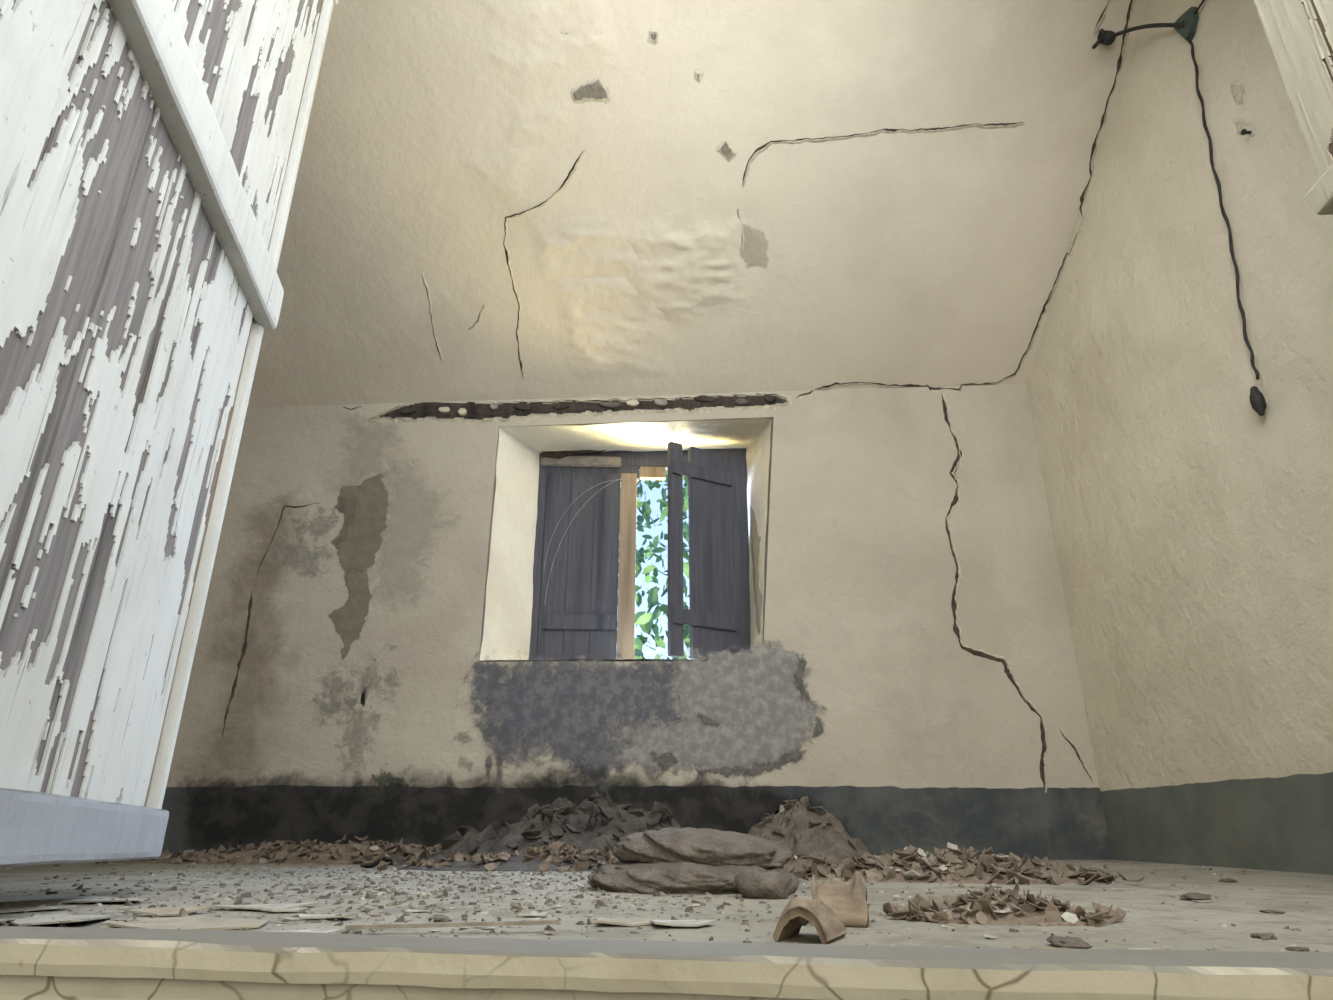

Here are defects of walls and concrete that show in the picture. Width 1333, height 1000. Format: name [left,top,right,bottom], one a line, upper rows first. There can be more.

peeling [0,0,253,806]
peeling [170,0,320,249]
crack [422,273,443,361]
crack [468,150,585,379]
crack [737,122,1024,251]
crack [797,0,1136,793]
peeling [1253,0,1333,177]
spalling [473,641,825,780]